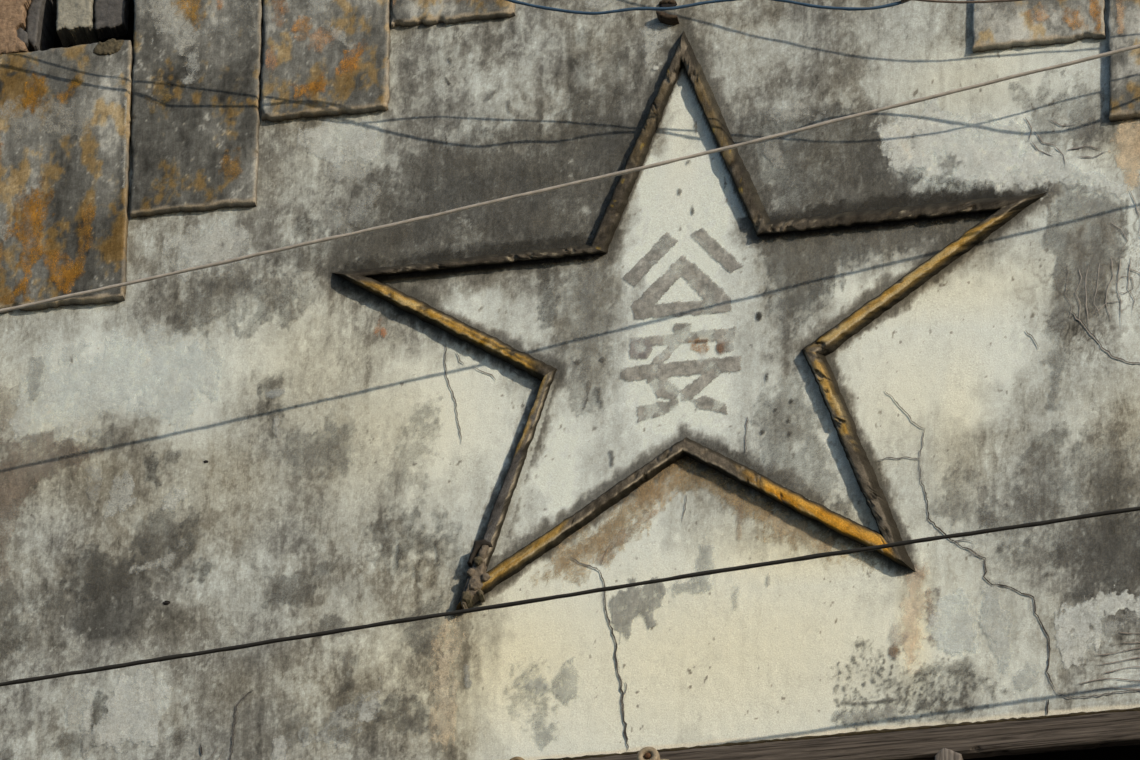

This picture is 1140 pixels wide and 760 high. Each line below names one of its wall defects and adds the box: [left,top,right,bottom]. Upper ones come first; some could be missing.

damp [334,84,632,265]
rust [0,188,95,305]
crack [444,346,463,443]
crack [1072,312,1140,364]
damp [0,431,103,555]
damp [371,508,442,567]
crack [880,392,1140,714]
damp [375,618,459,743]
crack [570,549,629,748]
damp [833,567,1006,730]
flaking render [1078,620,1140,693]